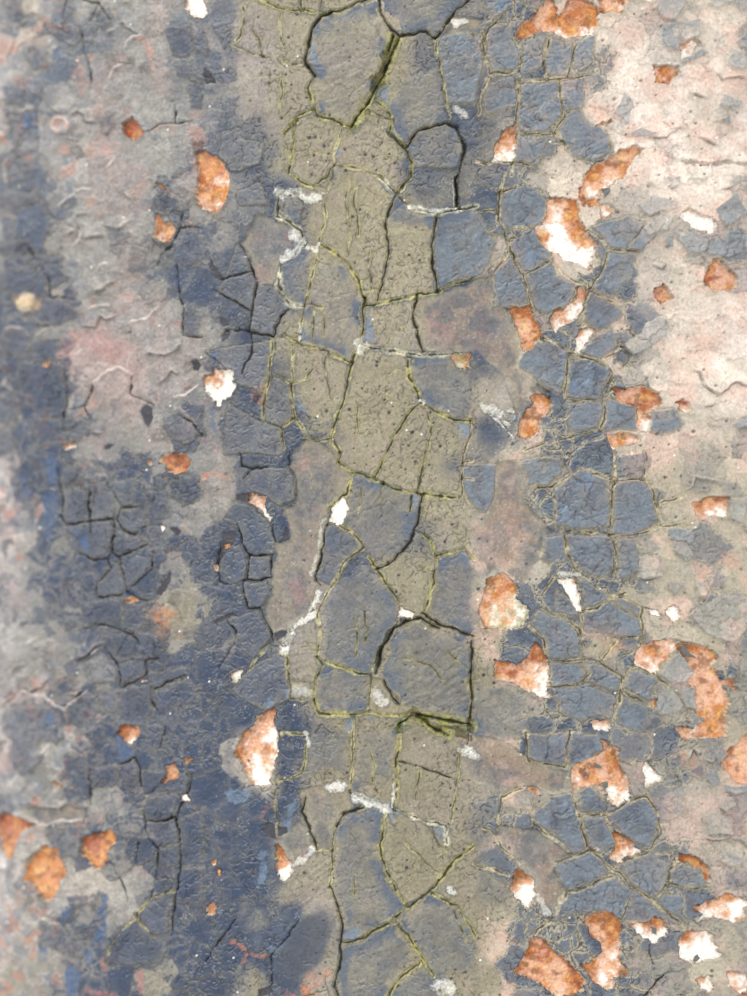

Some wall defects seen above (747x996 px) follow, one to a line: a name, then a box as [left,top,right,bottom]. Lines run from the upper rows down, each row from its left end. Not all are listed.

rust [534,145,644,271]
peeling [583,0,747,431]
crack [129,378,155,406]
crack [157,0,712,996]
peeling [557,576,582,611]
peeling [634,498,747,725]
crack [86,770,94,805]
crack [105,757,192,957]
rust [233,707,280,786]
rust [599,634,747,788]
peeling [657,746,747,882]
rust [513,893,747,996]